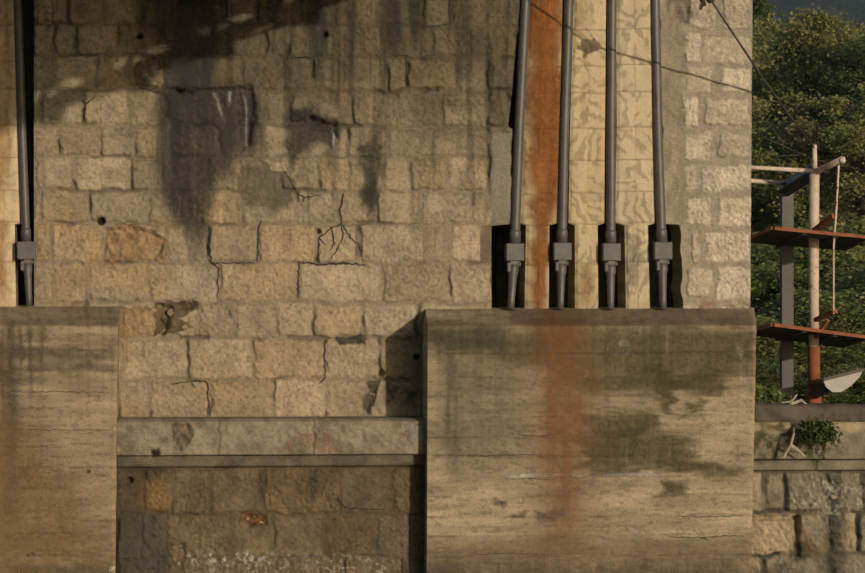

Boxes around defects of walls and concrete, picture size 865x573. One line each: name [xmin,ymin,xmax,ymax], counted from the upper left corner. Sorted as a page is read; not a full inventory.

leakage [159,0,258,235]
leakage [287,109,339,161]
leakage [359,143,382,202]
rust [529,0,562,309]
crack [297,193,366,299]
spalling [154,300,200,335]